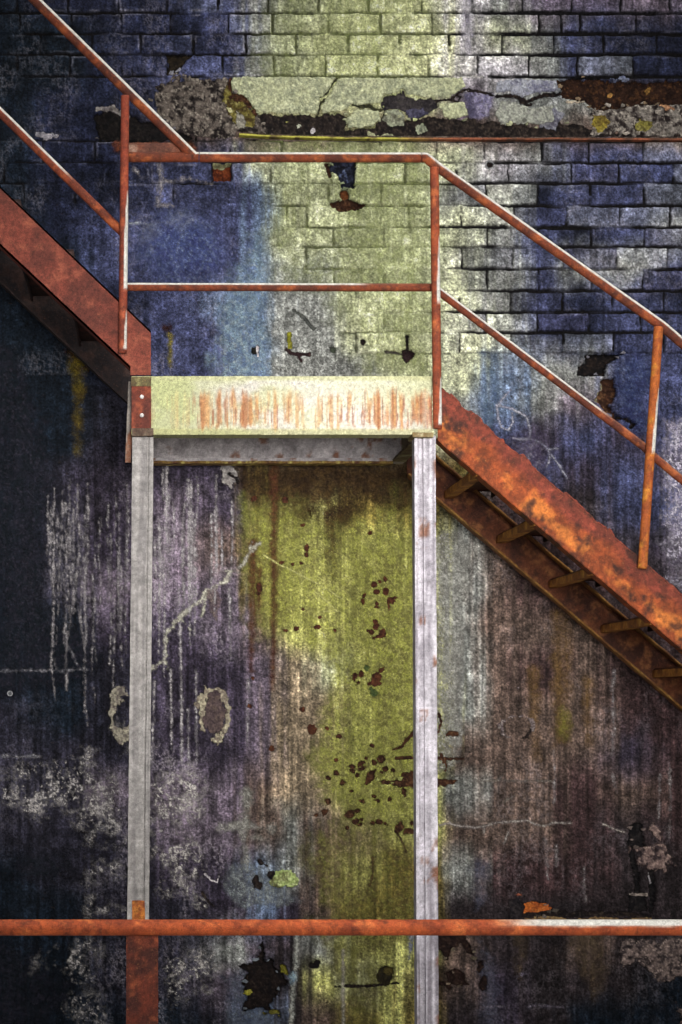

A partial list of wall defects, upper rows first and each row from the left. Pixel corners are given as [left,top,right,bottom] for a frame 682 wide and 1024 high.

crack [316,78,338,117]
crack [352,104,383,112]
flaking render [93,55,682,143]
crack [435,88,561,107]
spalling [324,162,366,212]
spalling [577,351,635,429]
damp [239,462,412,621]
damp [154,468,199,763]
damp [357,545,413,755]
flaking render [509,823,675,920]
spalling [239,942,288,1016]
damp [289,936,299,1024]